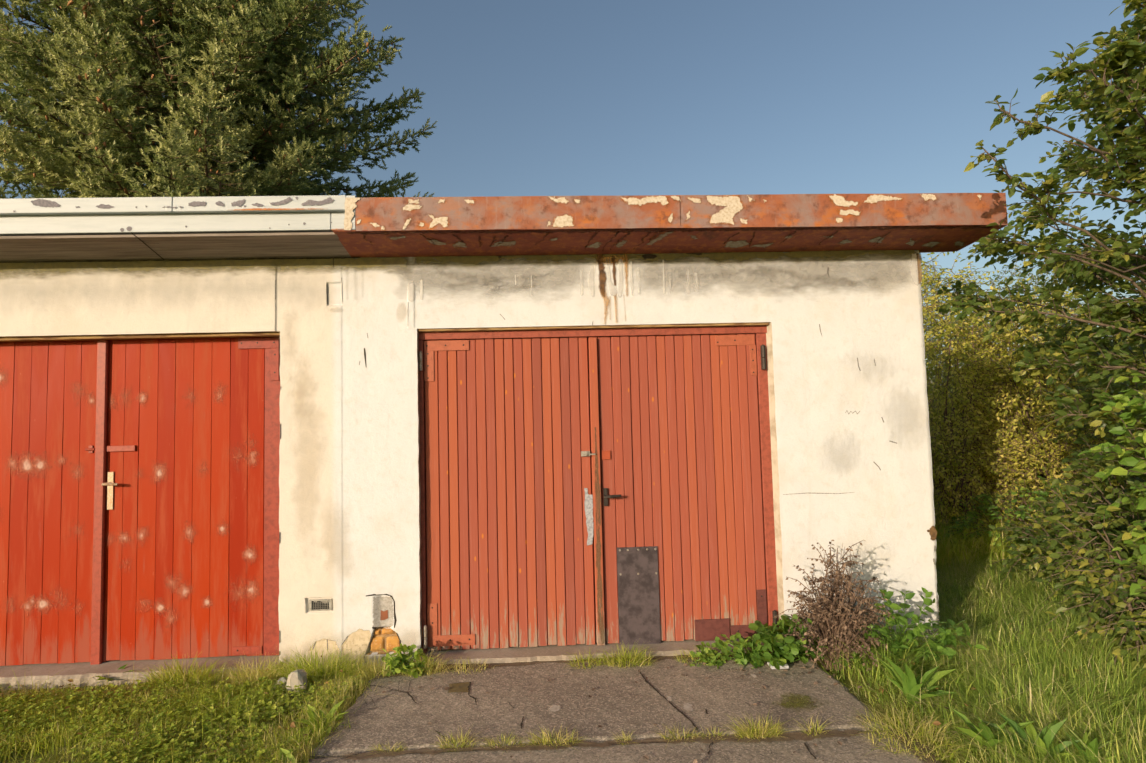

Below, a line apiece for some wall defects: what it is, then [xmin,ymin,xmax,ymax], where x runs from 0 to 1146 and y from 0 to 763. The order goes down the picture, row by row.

peeling [31,199,61,208]
peeling [162,197,466,248]
peeling [547,196,580,241]
peeling [621,195,767,259]
peeling [829,194,902,223]
water stain [0,250,917,301]
rust [332,226,992,320]
flaking render [307,594,401,664]
crack [638,670,713,754]